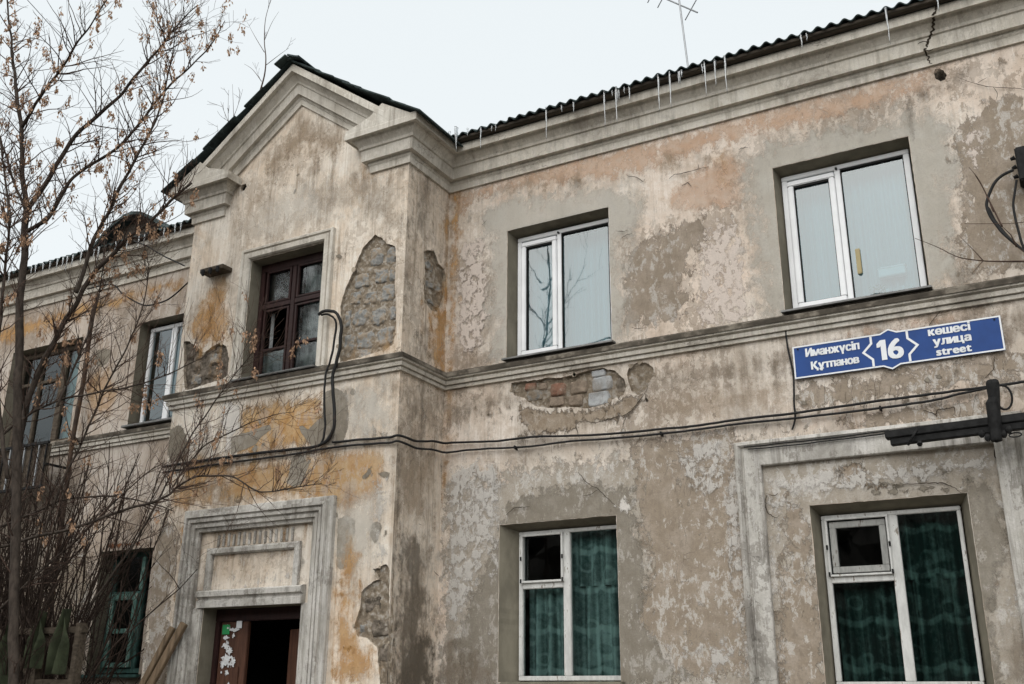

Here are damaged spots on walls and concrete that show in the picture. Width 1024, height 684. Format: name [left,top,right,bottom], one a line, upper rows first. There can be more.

flaking render [336,236,396,362]
flaking render [423,249,444,312]
flaking render [182,342,229,390]
flaking render [352,565,394,684]
peeling [436,360,756,684]
peeling [763,443,1024,684]